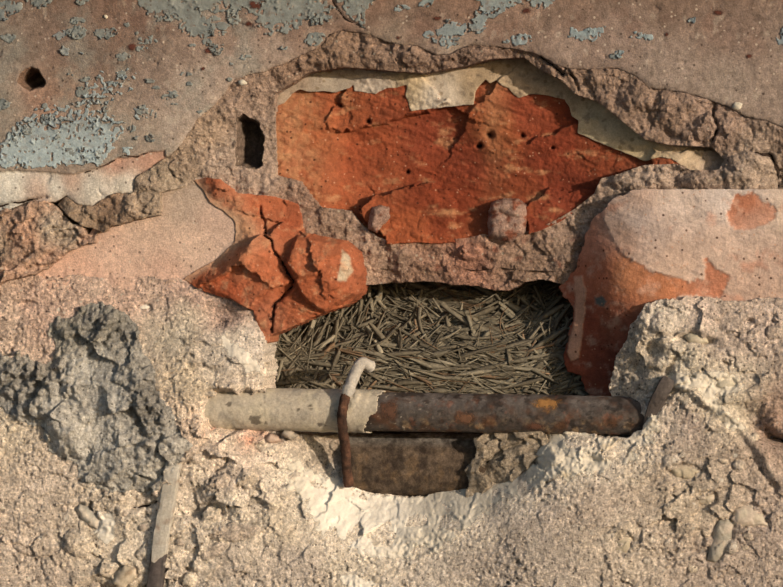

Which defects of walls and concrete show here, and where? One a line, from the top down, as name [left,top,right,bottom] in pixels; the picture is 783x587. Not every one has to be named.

spalling [0,0,783,291]
crack [755,152,780,187]
crack [261,212,294,330]
corrosion [535,399,557,409]